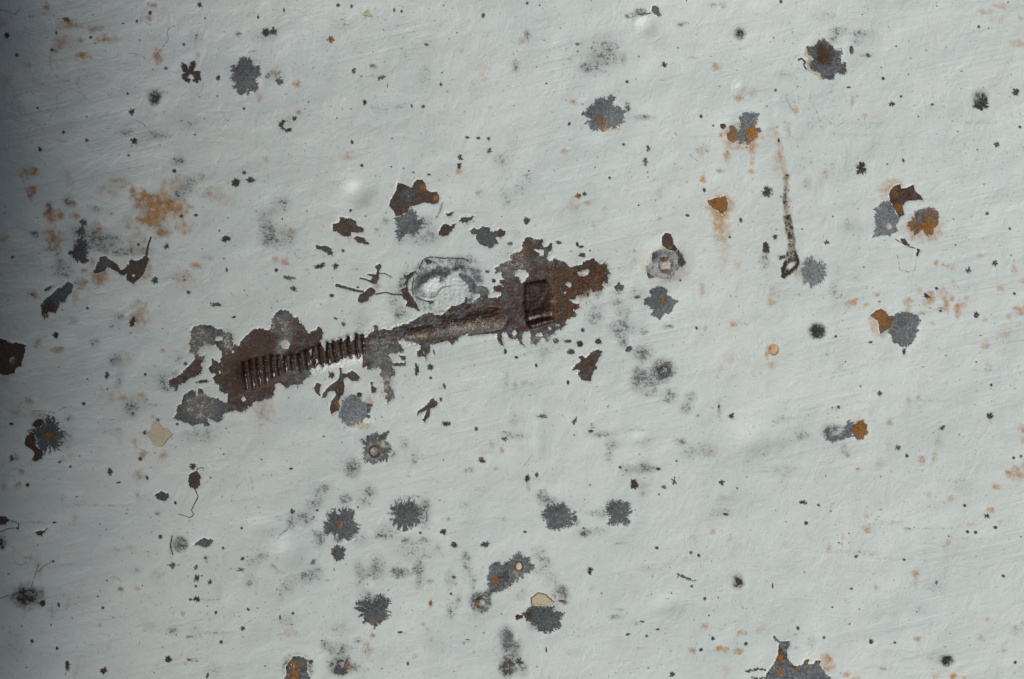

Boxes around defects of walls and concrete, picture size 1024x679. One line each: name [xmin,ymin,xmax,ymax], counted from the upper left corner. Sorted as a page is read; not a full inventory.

peeling [798,29,866,88]
peeling [581,94,630,132]
peeling [387,173,513,250]
corrosion [761,174,799,278]
peeling [872,182,939,258]
spalling [634,231,685,326]
peeling [868,307,921,354]
peeling [312,365,392,475]
peeling [316,507,360,561]
peeling [470,551,534,613]
peeling [499,591,566,676]
peeling [745,626,832,679]